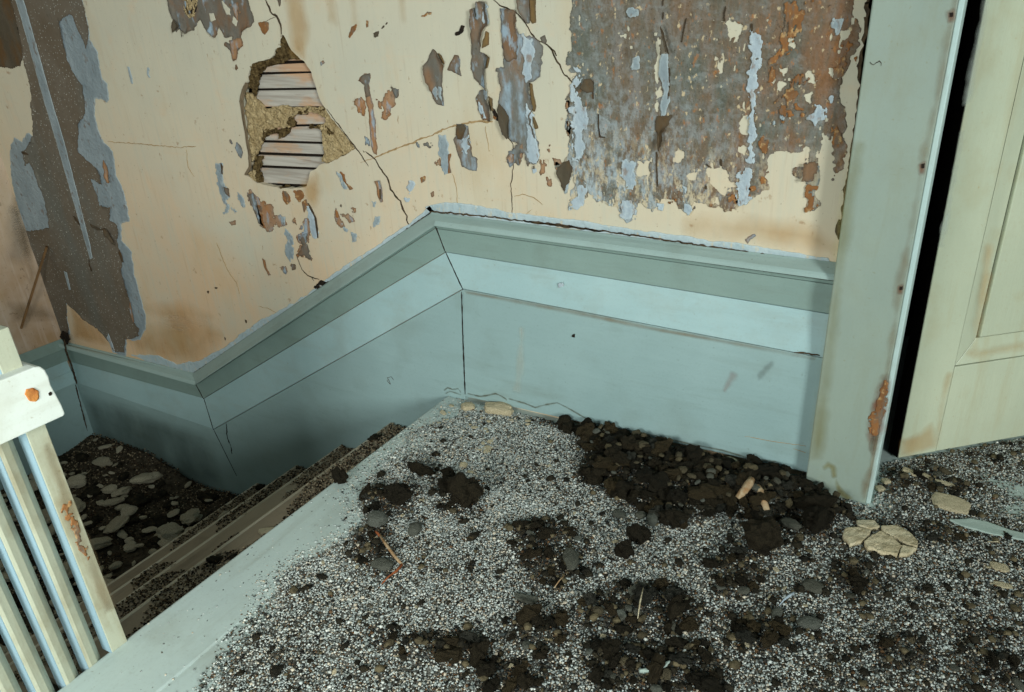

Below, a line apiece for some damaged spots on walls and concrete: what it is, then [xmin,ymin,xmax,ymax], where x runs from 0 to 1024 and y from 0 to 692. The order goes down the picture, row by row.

peeling [520,33,535,83]
flaking render [229,35,370,190]
peeling [476,90,498,121]
peeling [416,135,471,175]
peeling [262,206,319,276]
crack [327,110,784,390]
crack [63,340,88,431]
corrosion [868,380,888,442]
corrosion [61,501,90,561]